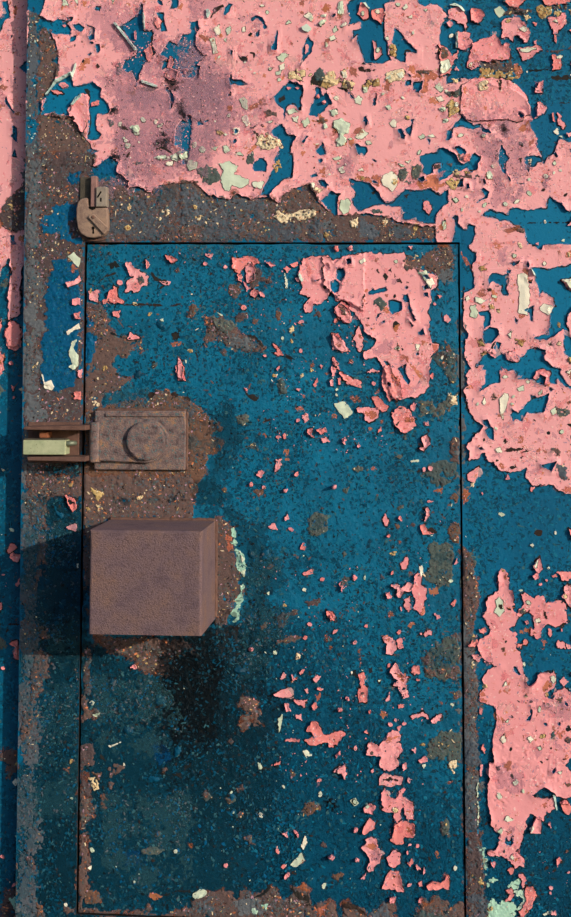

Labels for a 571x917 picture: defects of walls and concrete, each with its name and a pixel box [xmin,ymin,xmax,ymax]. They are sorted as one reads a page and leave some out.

rust [401,154,496,191]
rust [0,12,481,606]
rust [213,487,244,636]
peeling [300,512,329,550]
rust [260,585,365,660]
rust [0,618,50,779]
rust [238,697,262,731]
peeling [273,669,347,779]
peeling [338,667,381,714]
peeling [350,500,571,917]
rust [63,732,396,917]
spalling [281,830,311,906]